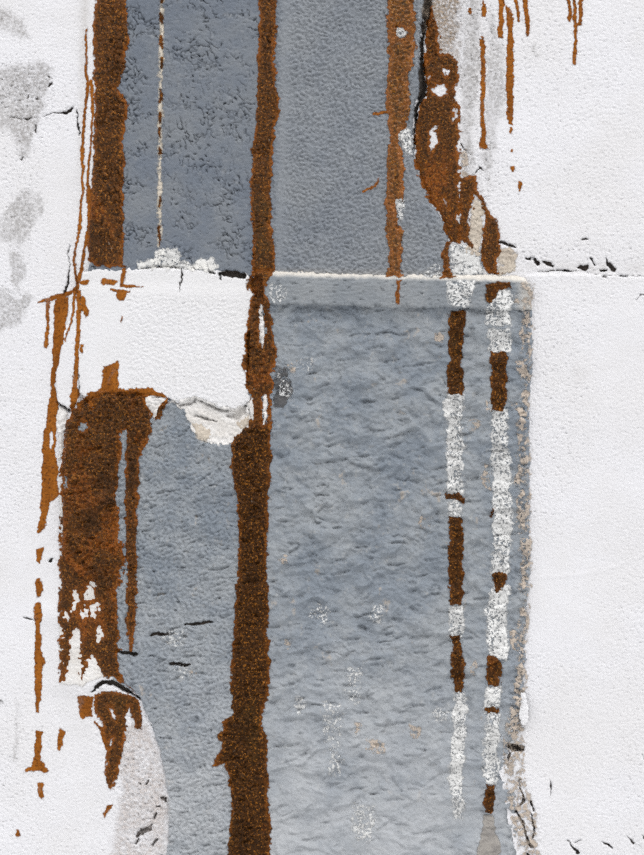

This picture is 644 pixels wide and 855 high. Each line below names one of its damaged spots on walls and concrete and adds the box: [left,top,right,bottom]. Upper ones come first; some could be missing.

corrosion [497,0,530,133]
corrosion [362,0,511,304]
flaking render [56,406,68,460]
corrosion [37,0,169,789]
flaking render [145,363,296,446]
corrosion [212,0,281,855]
corrosion [446,310,466,396]
corrosion [489,351,509,412]
corrosion [447,516,465,606]
peeling [442,281,541,855]
corrosion [33,578,45,713]
peeling [116,725,167,855]